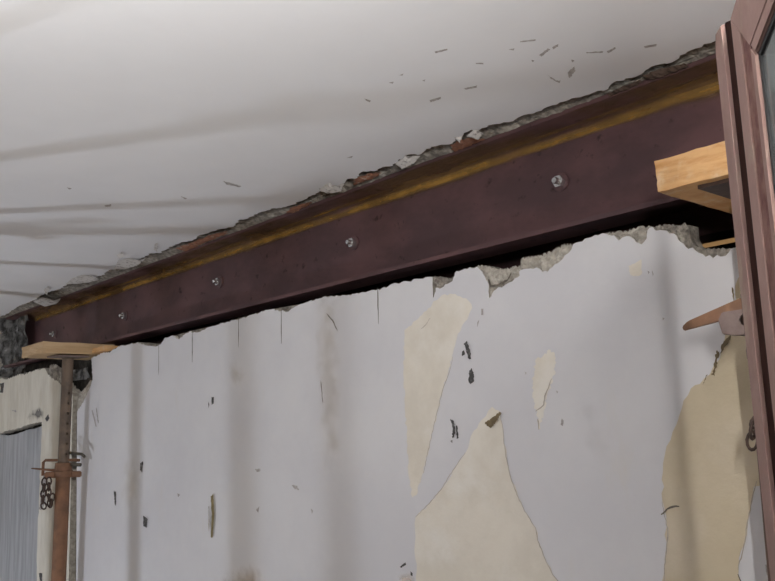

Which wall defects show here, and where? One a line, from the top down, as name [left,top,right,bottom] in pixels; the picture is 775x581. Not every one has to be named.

spalling [0,41,731,393]
peeling [403,276,483,497]
peeling [400,407,558,581]
peeling [662,335,760,581]
peeling [732,277,741,301]